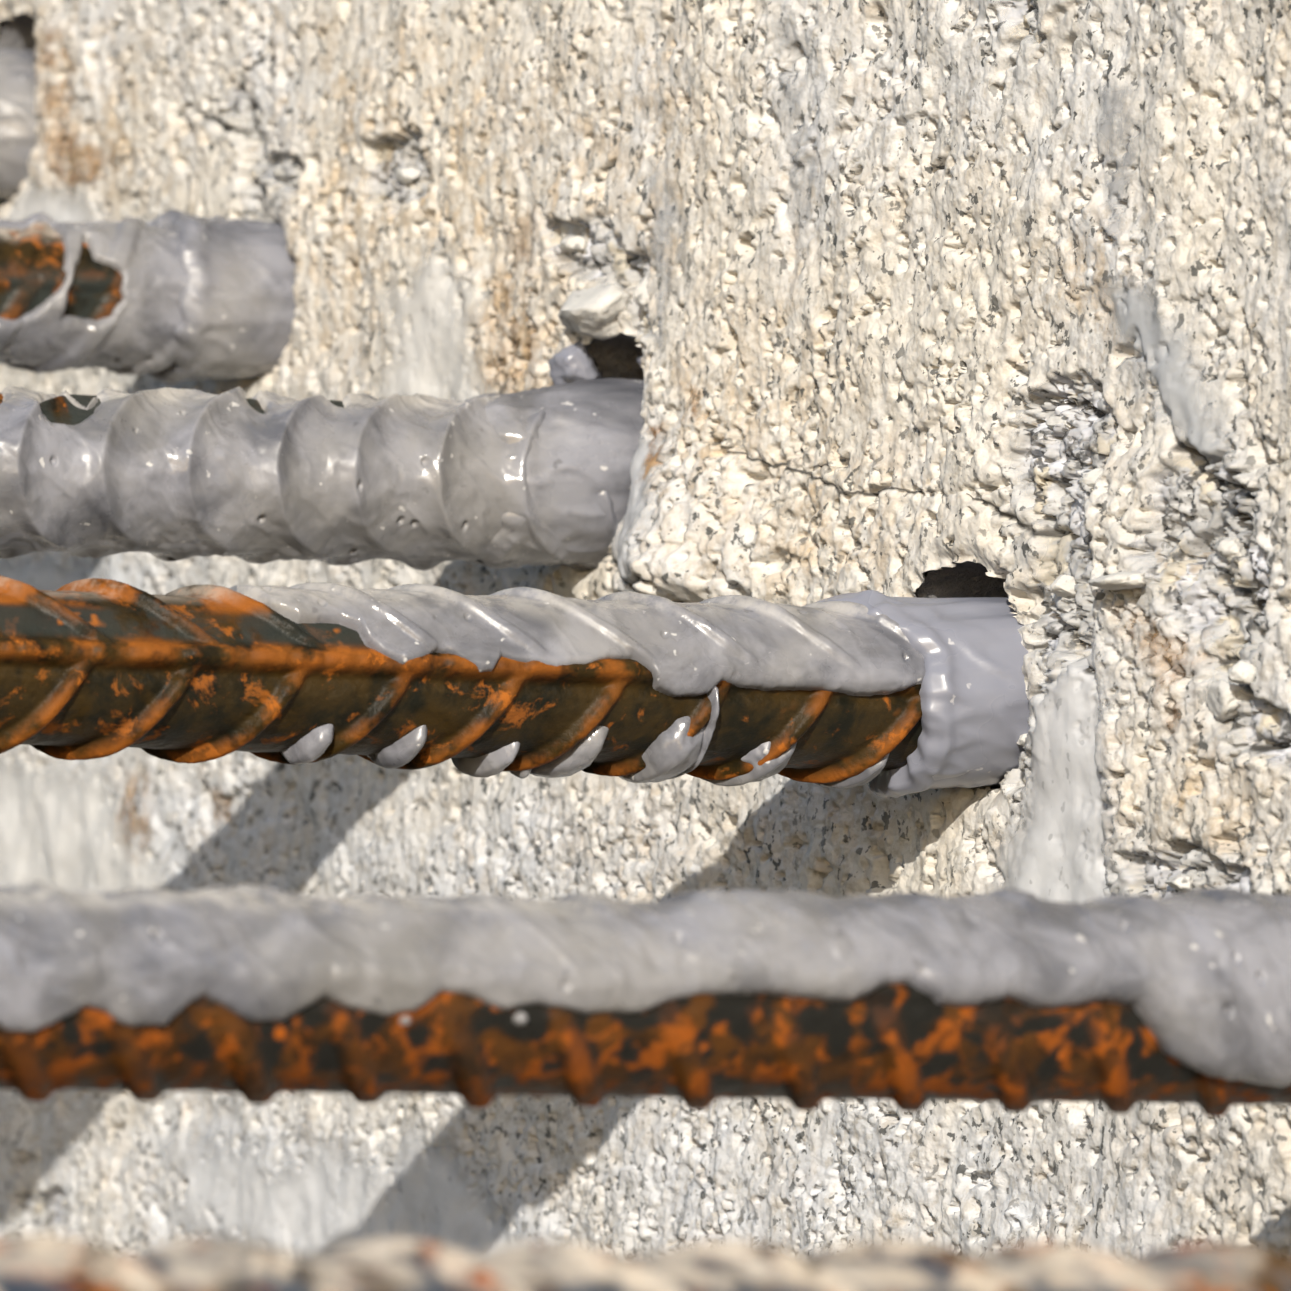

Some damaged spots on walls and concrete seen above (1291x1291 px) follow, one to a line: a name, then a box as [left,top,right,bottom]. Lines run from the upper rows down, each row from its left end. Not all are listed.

spalling [551,218,652,341]
crack [700,440,1076,538]
spalling [1015,373,1291,766]
spalling [1009,730,1033,788]